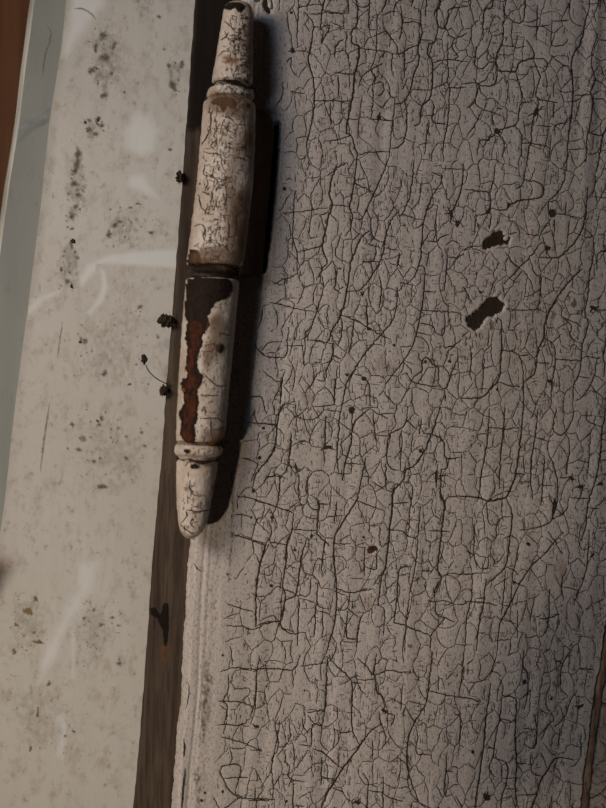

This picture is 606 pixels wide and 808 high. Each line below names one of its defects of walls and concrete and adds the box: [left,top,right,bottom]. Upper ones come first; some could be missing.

peeling [255,0,272,14]
crack [194,14,254,277]
peeling [482,231,509,250]
peeling [466,291,504,330]
corrosion [179,275,233,454]